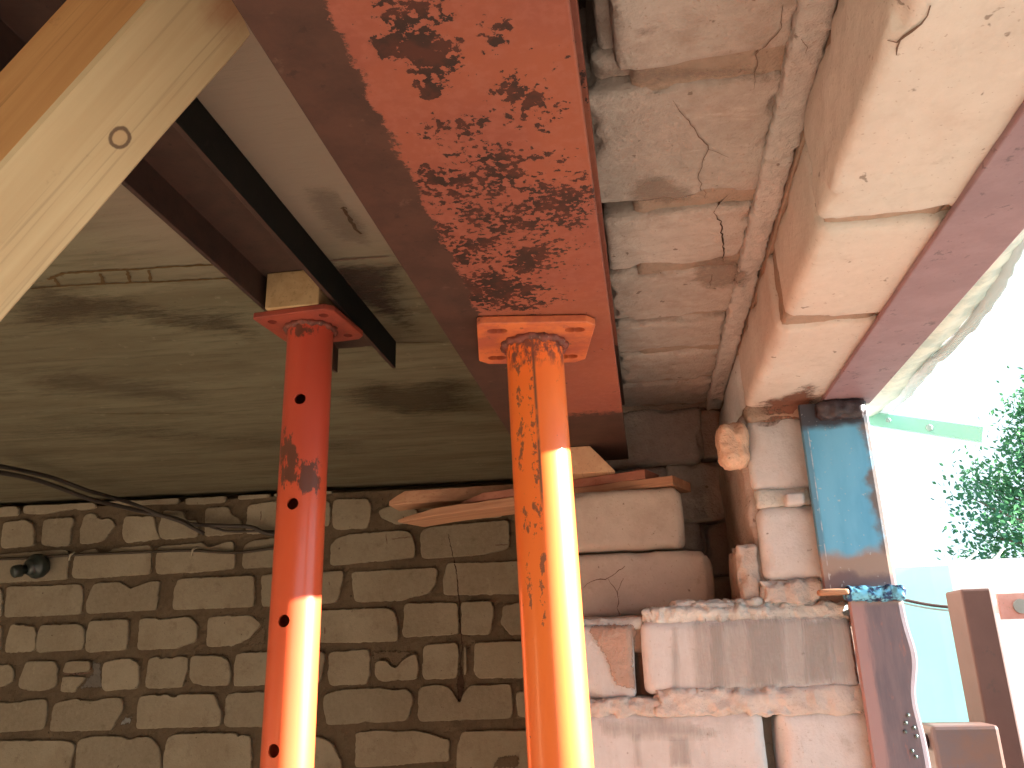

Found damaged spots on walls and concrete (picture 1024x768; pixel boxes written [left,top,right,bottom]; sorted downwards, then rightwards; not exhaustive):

crack [887,5,931,55]
crack [673,101,727,288]
crack [448,534,464,702]
crack [585,566,625,616]